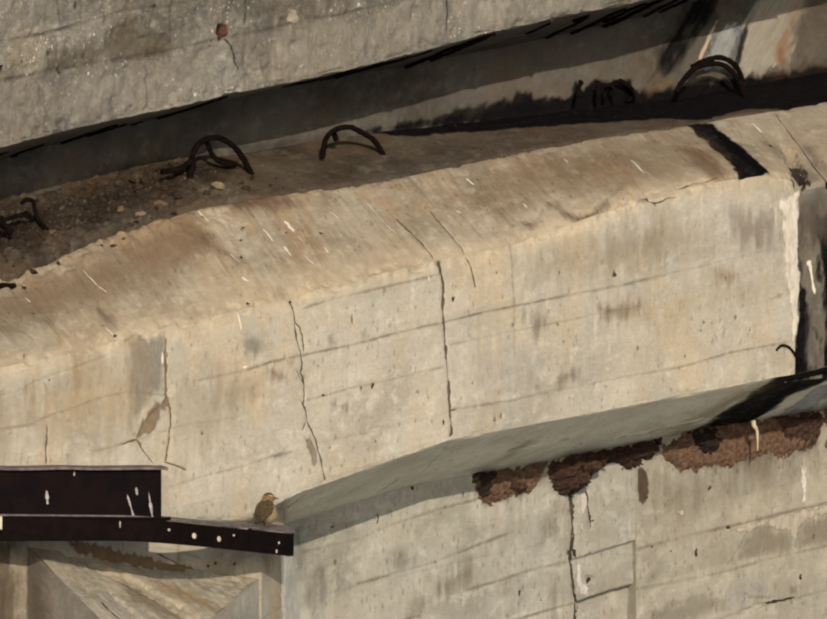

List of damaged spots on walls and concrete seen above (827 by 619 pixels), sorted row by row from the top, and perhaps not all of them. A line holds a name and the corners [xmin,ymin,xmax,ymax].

corrosion [216,23,228,40]
damp [365,0,827,180]
spalling [0,197,49,236]
crack [121,338,186,470]
spalling [160,135,254,179]
crack [289,300,326,481]
crack [396,219,455,437]
crack [431,212,476,288]
damp [699,191,827,429]
crack [566,492,594,619]